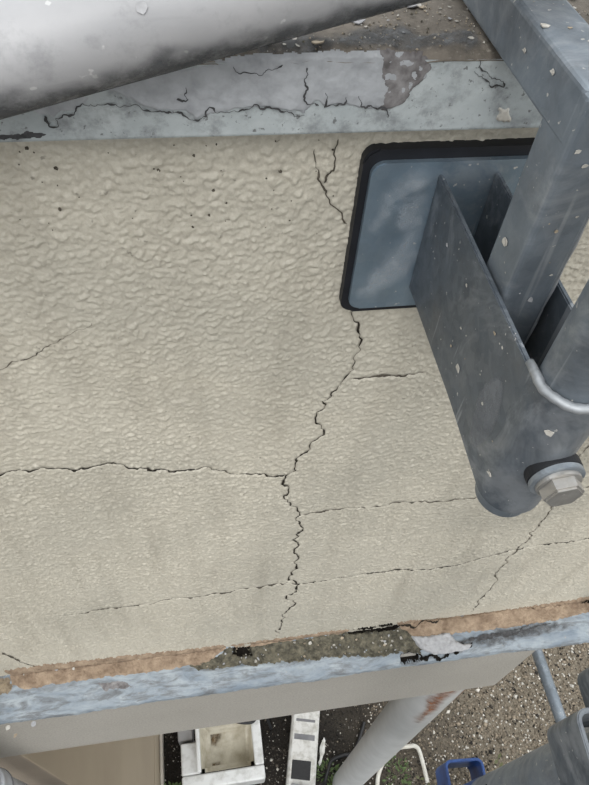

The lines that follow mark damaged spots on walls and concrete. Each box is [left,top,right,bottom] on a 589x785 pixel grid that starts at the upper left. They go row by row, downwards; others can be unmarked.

peeling [0,49,427,140]
crack [477,61,505,88]
crack [313,140,347,224]
crack [0,312,589,633]
spalling [0,596,589,695]